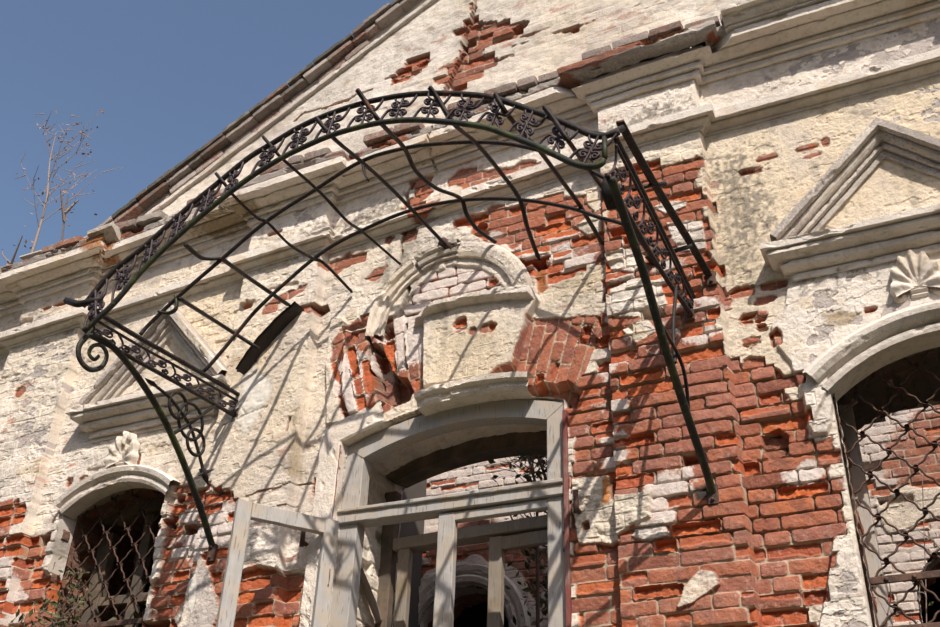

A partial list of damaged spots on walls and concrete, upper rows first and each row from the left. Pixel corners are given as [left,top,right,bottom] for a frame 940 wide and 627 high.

crack [445,0,478,97]
spalling [387,2,592,91]
peeling [788,18,940,77]
spalling [214,20,726,201]
spalling [0,236,107,274]
spalling [316,251,367,277]
spalling [329,264,503,417]
spalling [448,147,868,627]
peeling [807,289,911,325]
spalling [0,494,78,627]
spalling [143,480,239,627]
spalling [234,520,310,627]